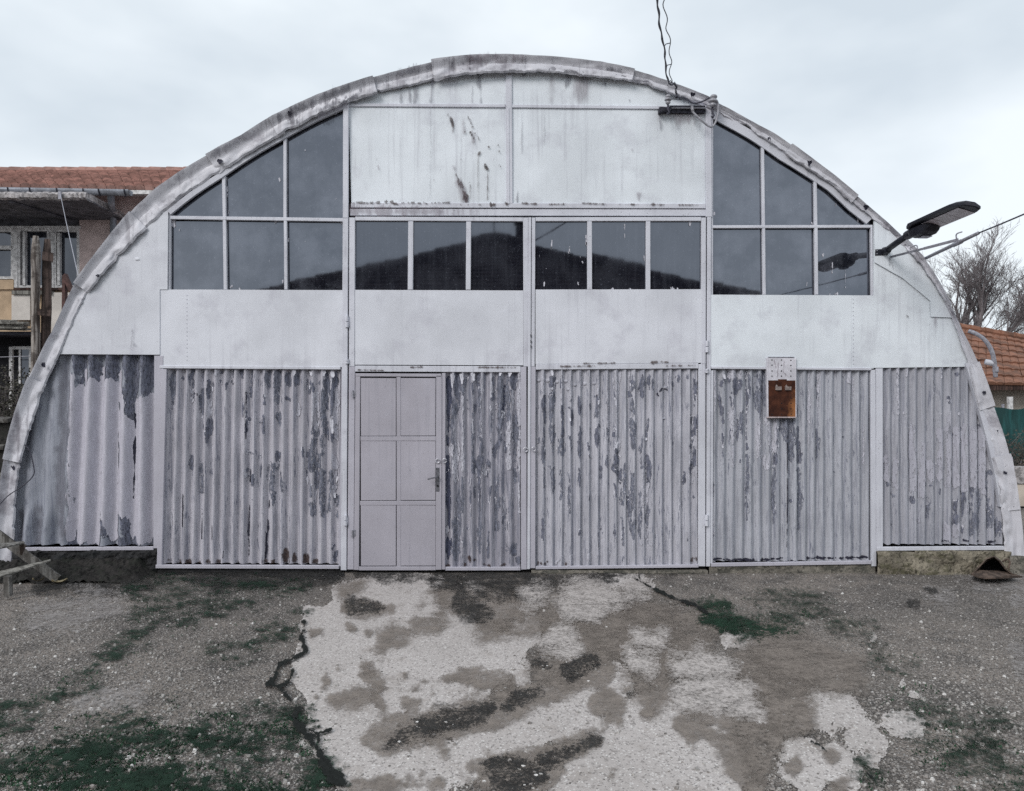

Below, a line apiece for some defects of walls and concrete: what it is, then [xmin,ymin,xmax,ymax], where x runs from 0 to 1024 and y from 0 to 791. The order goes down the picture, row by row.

corrosion [353,117,508,207]
peeling [68,516,154,546]
peeling [71,354,155,420]
peeling [169,369,339,518]
peeling [445,372,519,561]
peeling [537,370,654,562]
peeling [667,374,698,510]
peeling [717,370,766,521]
corrosion [768,379,796,417]
peeling [771,392,804,529]
peeling [909,468,1007,537]
crack [265,620,347,787]